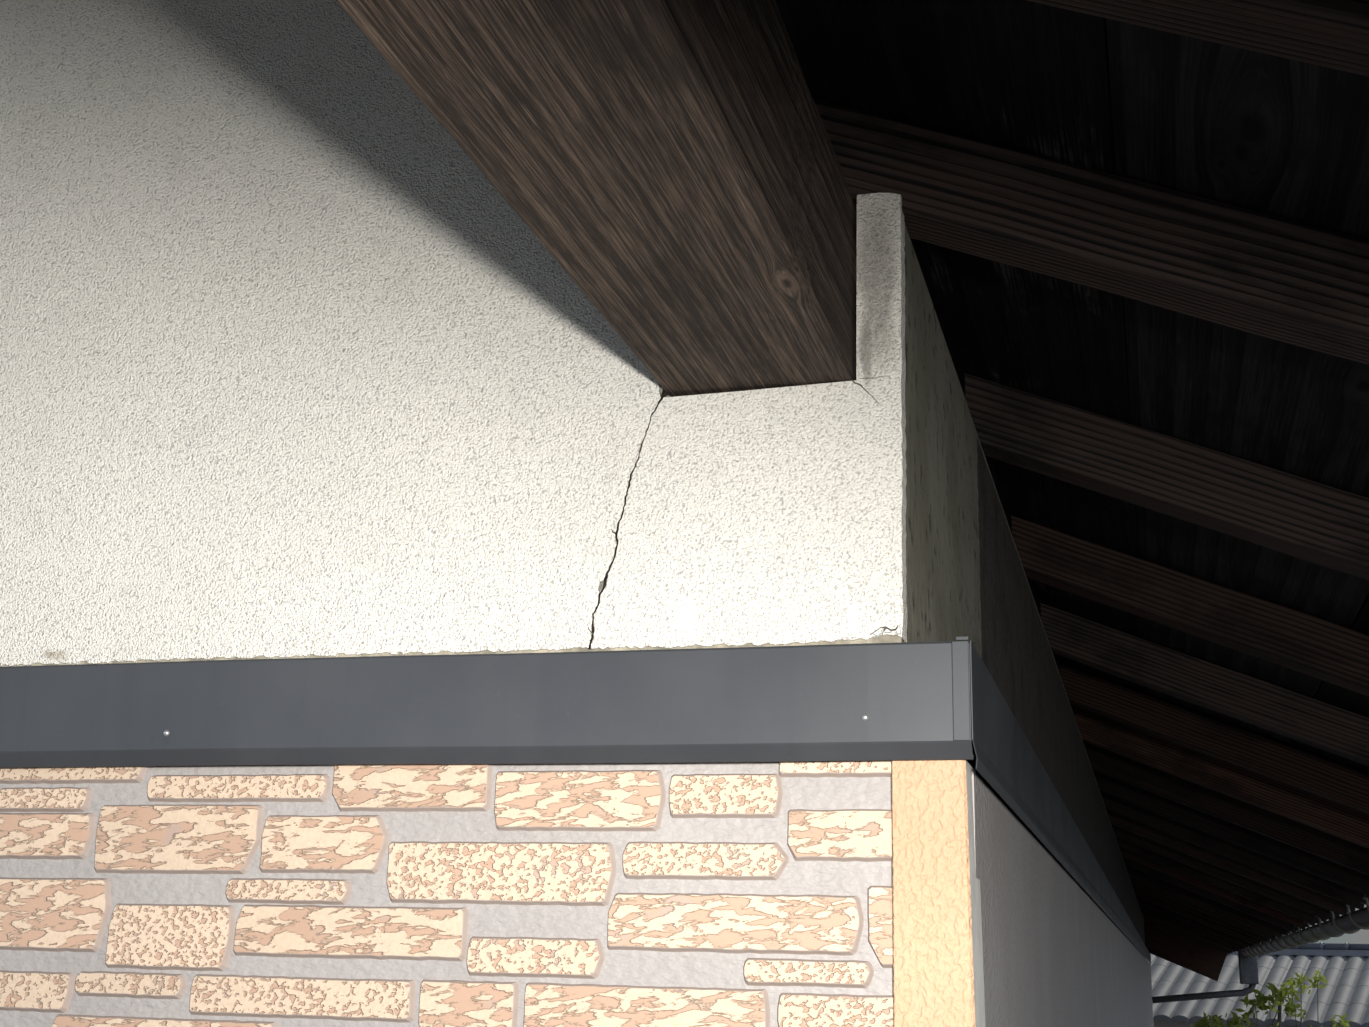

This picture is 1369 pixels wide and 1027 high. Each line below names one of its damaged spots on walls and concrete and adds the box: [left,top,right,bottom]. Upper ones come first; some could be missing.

crack [587,392,663,649]